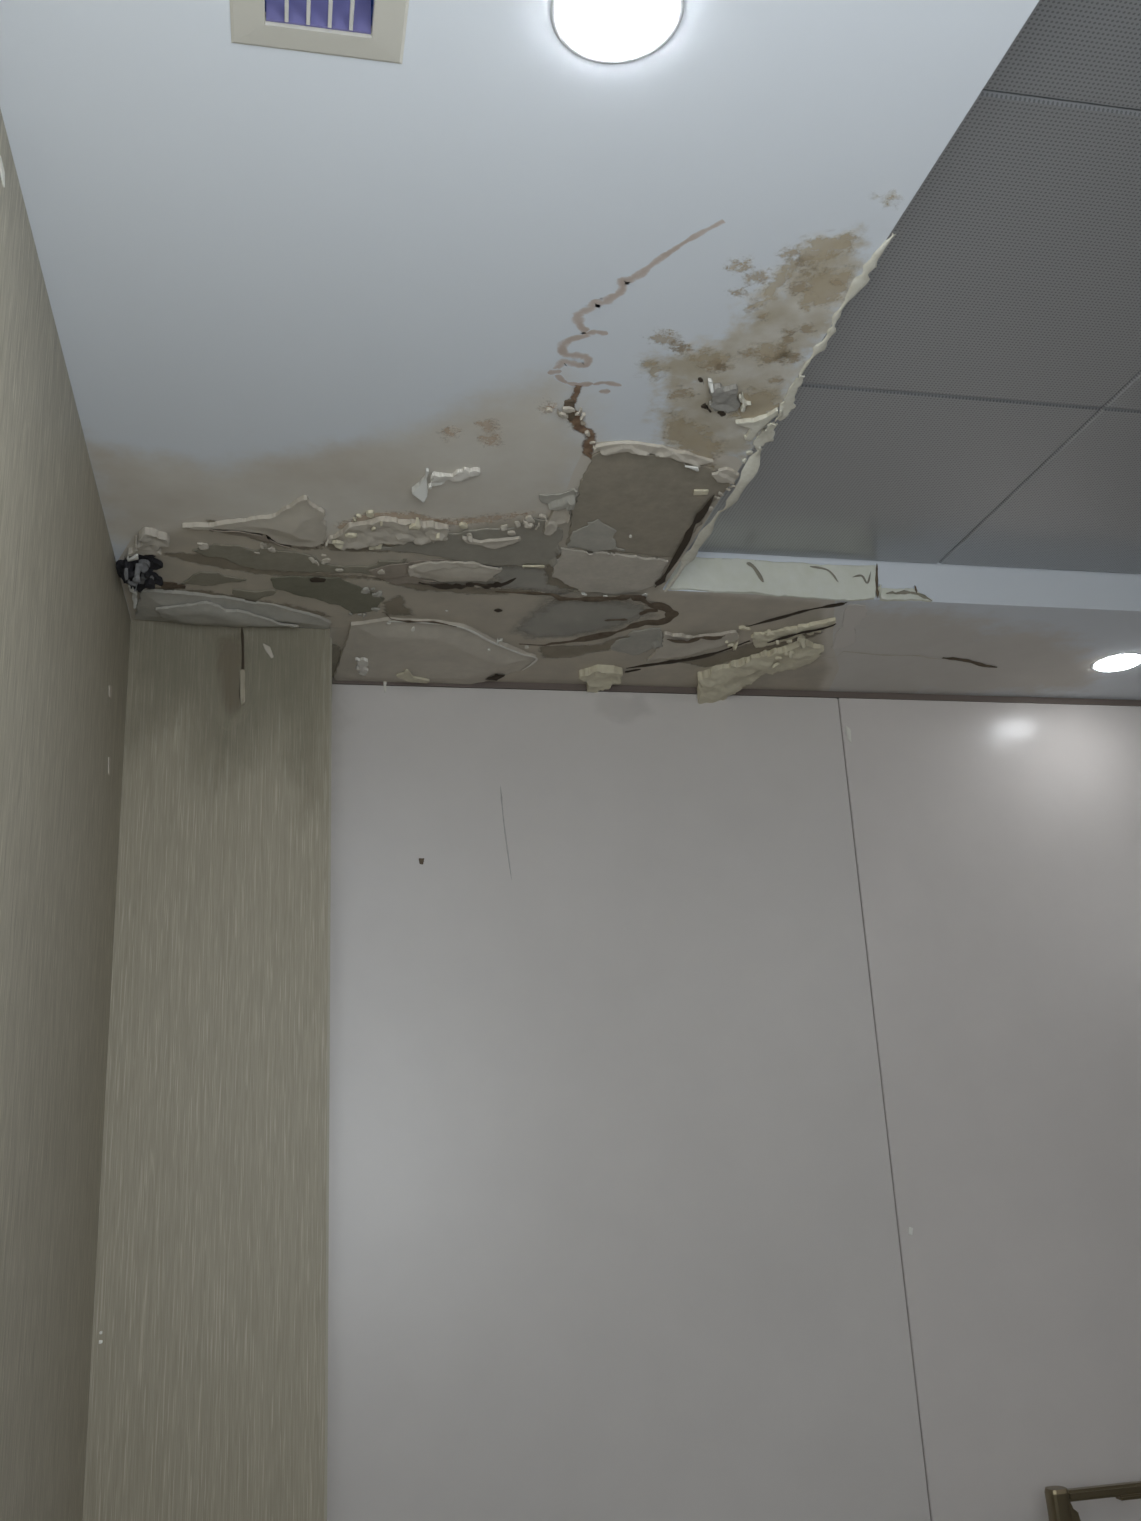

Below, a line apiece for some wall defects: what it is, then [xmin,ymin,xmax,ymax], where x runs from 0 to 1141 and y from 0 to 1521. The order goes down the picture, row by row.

flaking render [127,233,932,704]
leakage [77,204,1141,699]